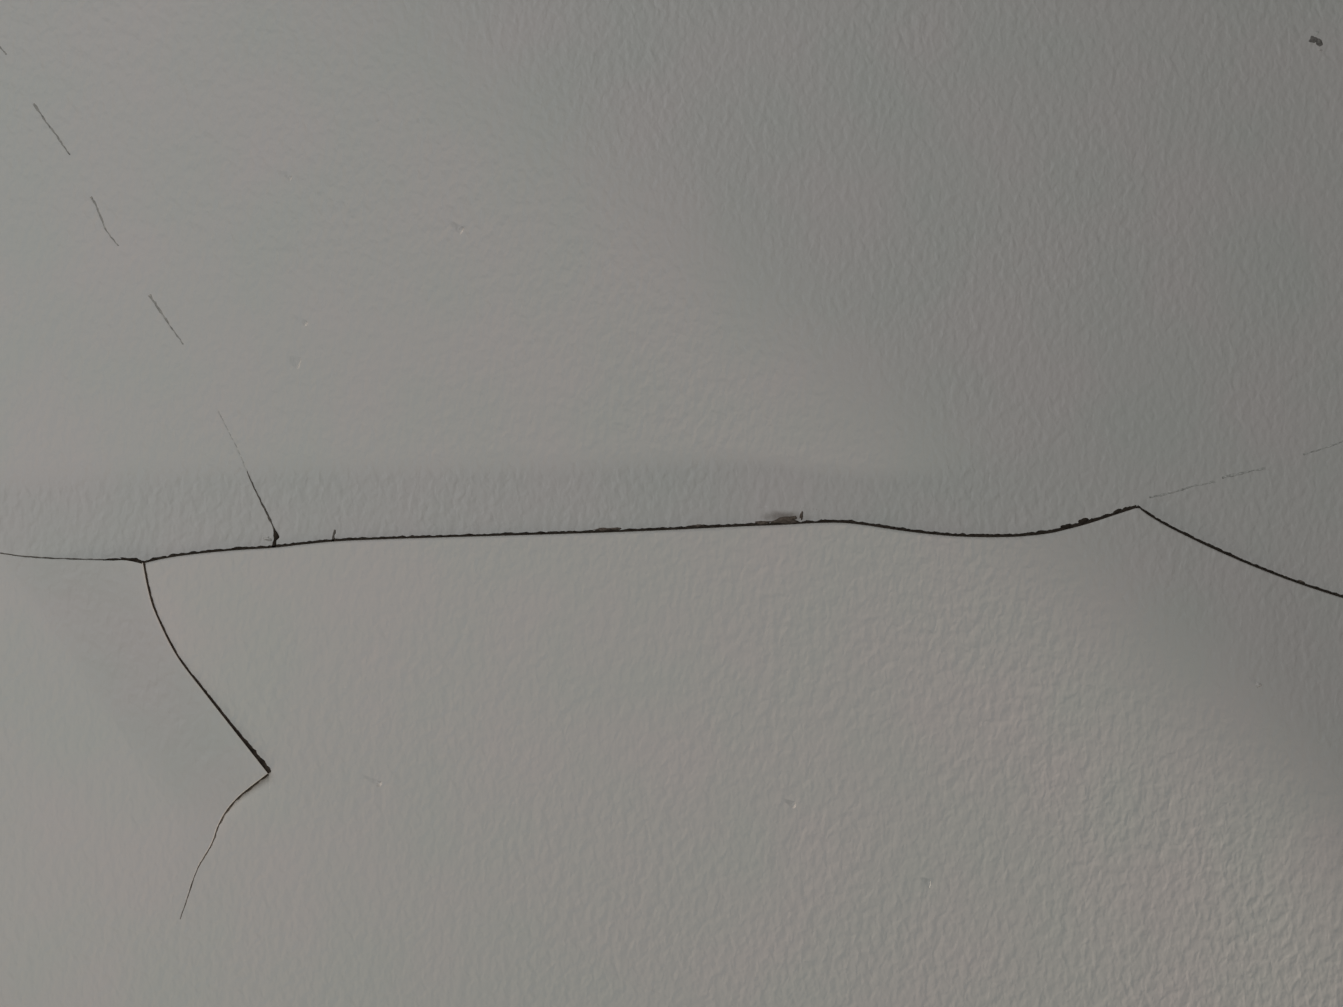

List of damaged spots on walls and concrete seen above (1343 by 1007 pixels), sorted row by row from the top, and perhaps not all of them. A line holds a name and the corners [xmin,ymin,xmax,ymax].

crack [33,103,70,155]
crack [90,197,119,246]
crack [148,294,183,344]
crack [0,411,1343,919]